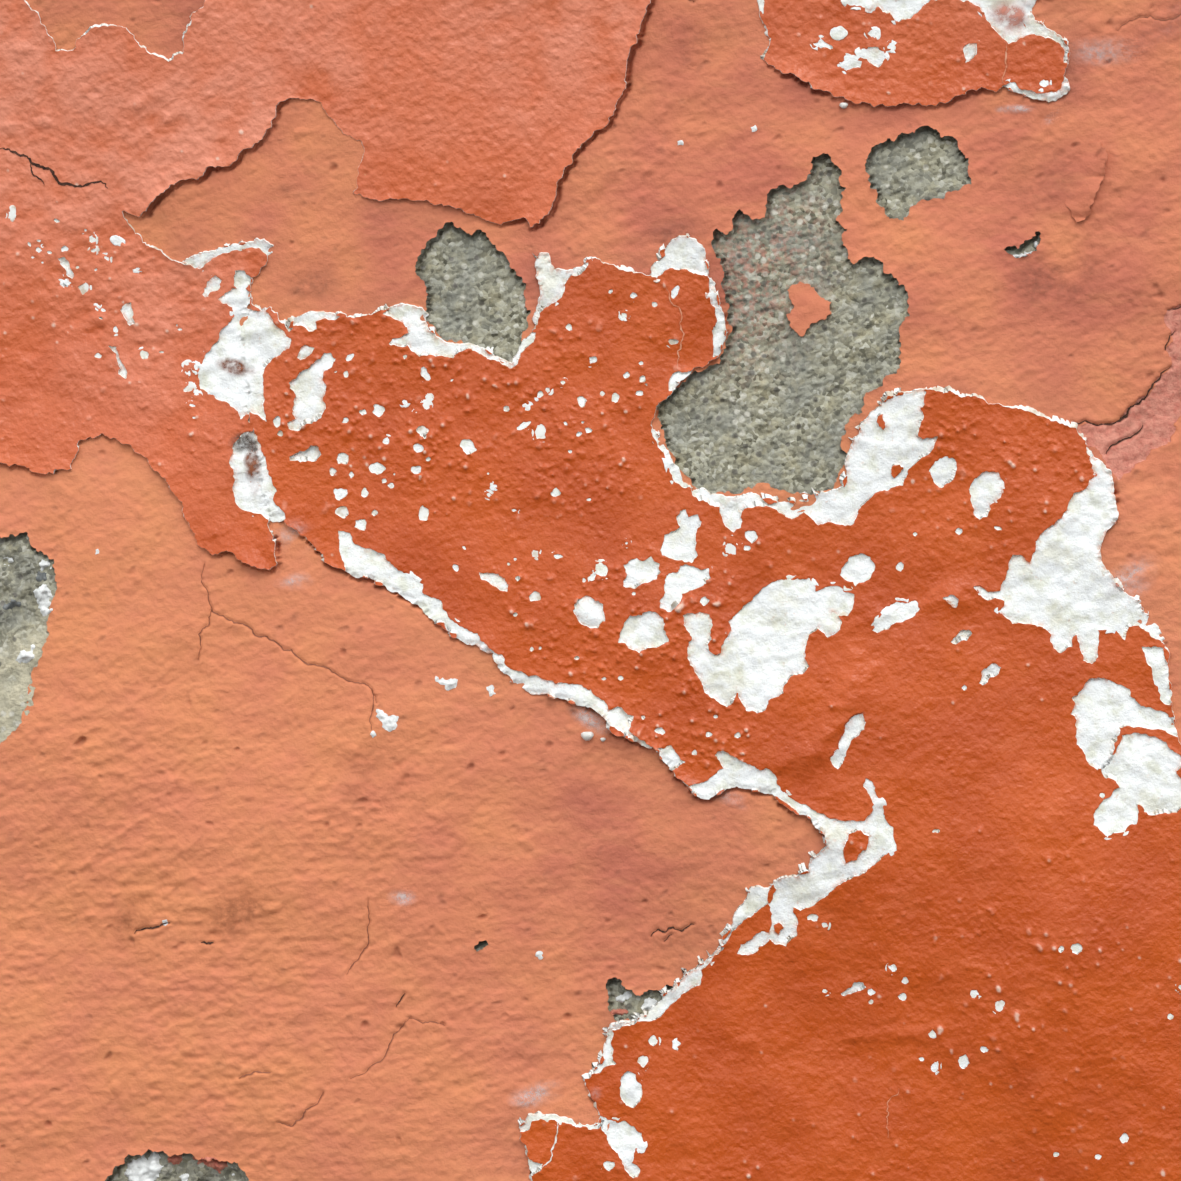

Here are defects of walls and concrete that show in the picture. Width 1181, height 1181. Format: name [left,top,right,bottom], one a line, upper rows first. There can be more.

peeling [757,0,1070,107]
crack [0,148,108,188]
spalling [865,125,971,220]
spalling [1004,231,1041,258]
peeling [881,388,904,402]
peeling [890,463,904,478]
peeling [592,563,608,576]
peeling [943,595,959,608]
peeling [606,721,635,742]
peeling [1109,725,1181,756]
peeling [842,829,869,863]
spalling [105,1149,249,1181]